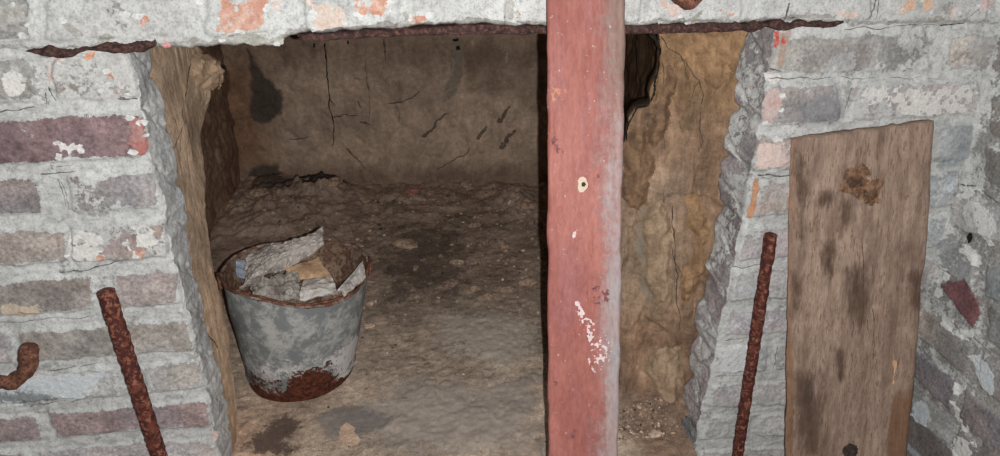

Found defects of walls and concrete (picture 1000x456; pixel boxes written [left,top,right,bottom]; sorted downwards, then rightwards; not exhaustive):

leakage [248,51,282,128]
crack [324,39,386,147]